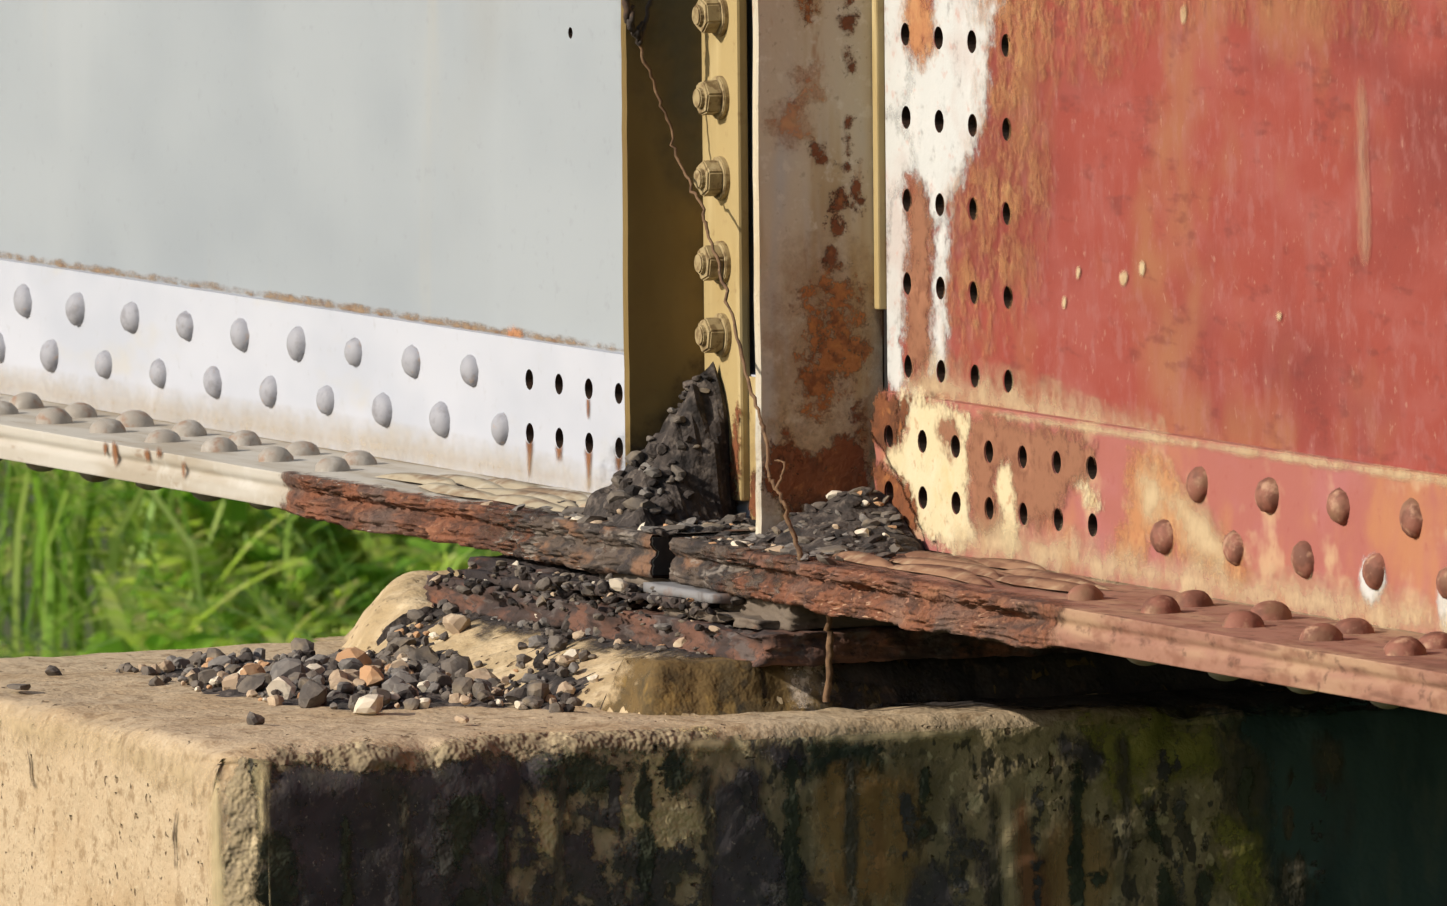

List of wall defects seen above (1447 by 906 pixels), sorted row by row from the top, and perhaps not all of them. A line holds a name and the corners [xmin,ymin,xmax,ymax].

corrosion [904,0,934,63]
corrosion [729,68,935,531]
corrosion [960,153,1039,327]
peeling [832,0,1447,633]
corrosion [280,471,547,560]
corrosion [938,413,1095,537]
corrosion [650,533,1068,649]
damp [248,741,831,906]
damp [843,757,859,906]
damp [898,767,1006,906]
damp [1030,784,1046,906]
damp [1059,734,1214,906]